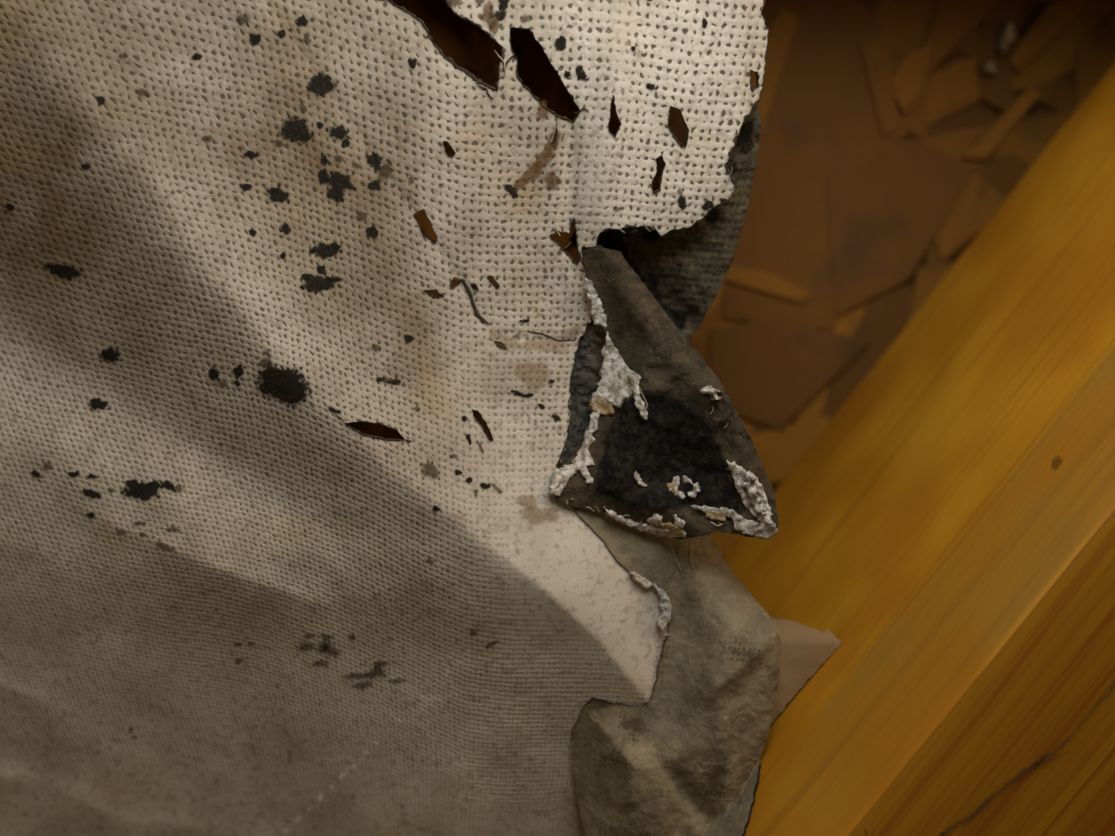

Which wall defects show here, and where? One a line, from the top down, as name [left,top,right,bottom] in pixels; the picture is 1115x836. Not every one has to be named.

damp [448,0,509,30]
damp [554,36,567,50]
damp [564,65,588,81]
damp [272,71,393,202]
damp [266,184,290,203]
damp [300,241,343,294]
damp [208,349,316,410]
damp [507,389,561,421]
damp [68,471,185,519]
damp [449,454,503,496]
peeling [548,104,781,836]
crack [939,683,1115,836]